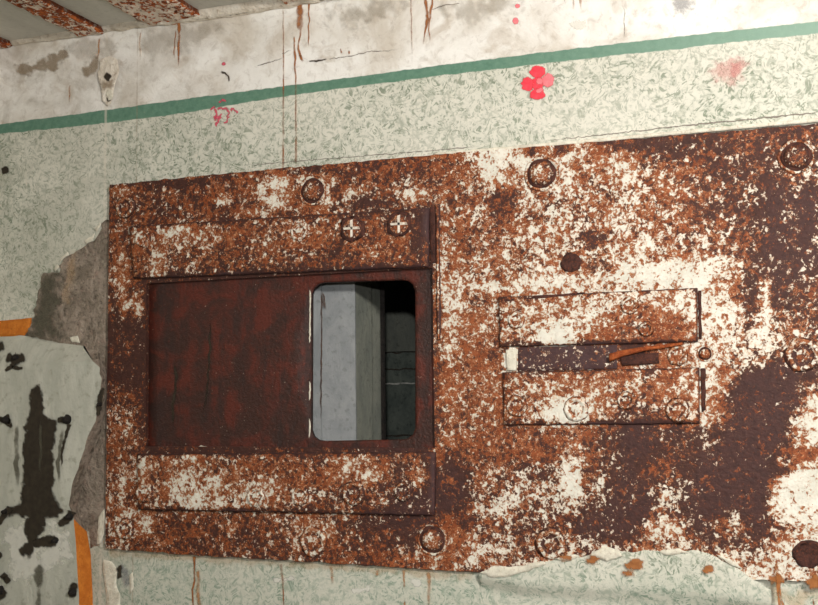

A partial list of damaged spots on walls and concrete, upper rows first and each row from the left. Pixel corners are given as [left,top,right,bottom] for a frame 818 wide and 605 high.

corrosion [424,0,433,37]
corrosion [294,4,310,129]
spalling [25,220,109,371]
spalling [76,395,107,548]
water stain [4,521,74,605]
flaking render [102,560,134,605]
corrosion [622,558,643,576]
corrosion [769,564,784,605]
corrosion [805,574,818,589]